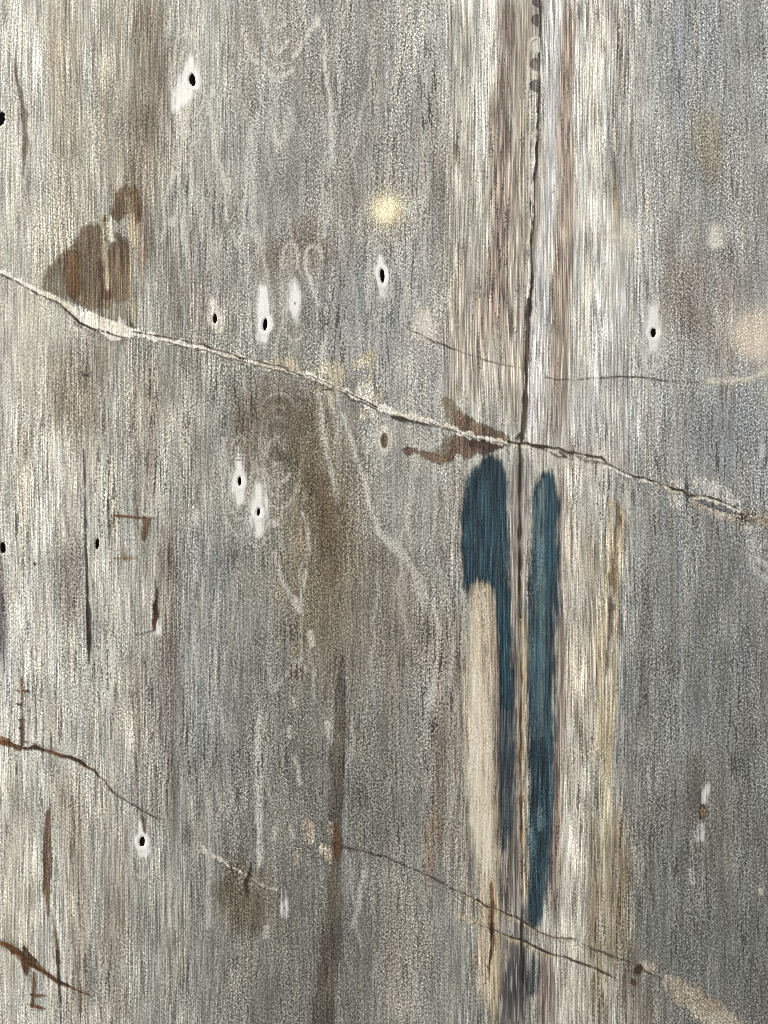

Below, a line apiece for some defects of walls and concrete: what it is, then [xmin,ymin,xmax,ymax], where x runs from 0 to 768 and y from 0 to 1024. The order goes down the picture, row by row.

water stain [43,182,141,329]
crack [0,0,742,513]
crack [695,366,768,385]
crack [517,444,527,900]
crack [0,677,164,821]
crack [0,810,89,1024]
crack [199,842,278,895]
crack [320,841,405,866]
crack [411,868,490,908]
crack [494,885,612,976]
crack [588,946,632,963]
crack [631,964,656,986]